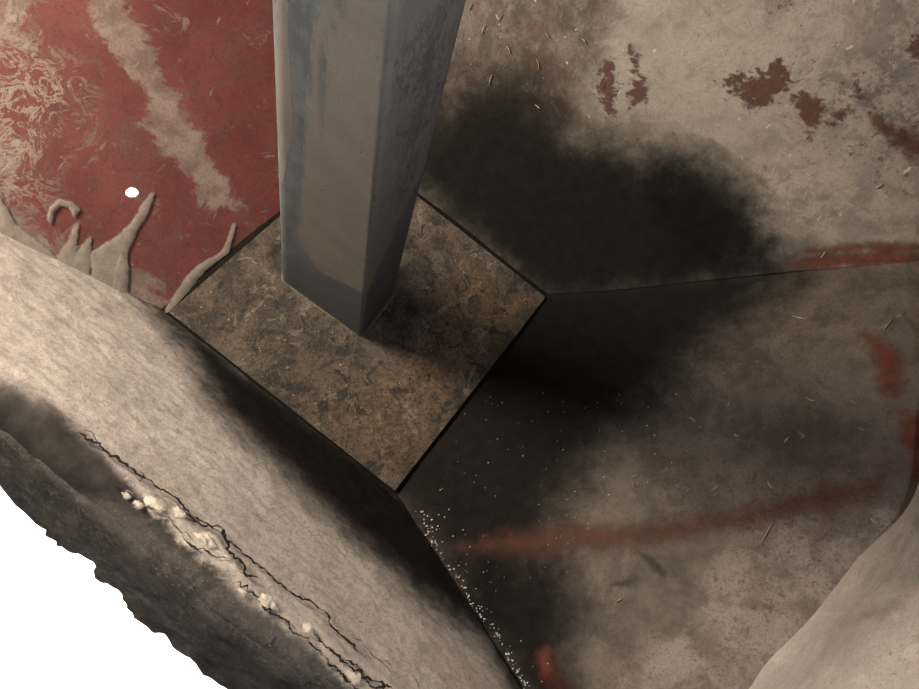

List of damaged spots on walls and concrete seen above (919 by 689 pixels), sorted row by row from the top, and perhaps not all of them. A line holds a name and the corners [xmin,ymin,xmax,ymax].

leakage [153,74,800,689]
corrosion [794,243,919,268]
corrosion [872,115,919,159]
crack [79,430,420,689]